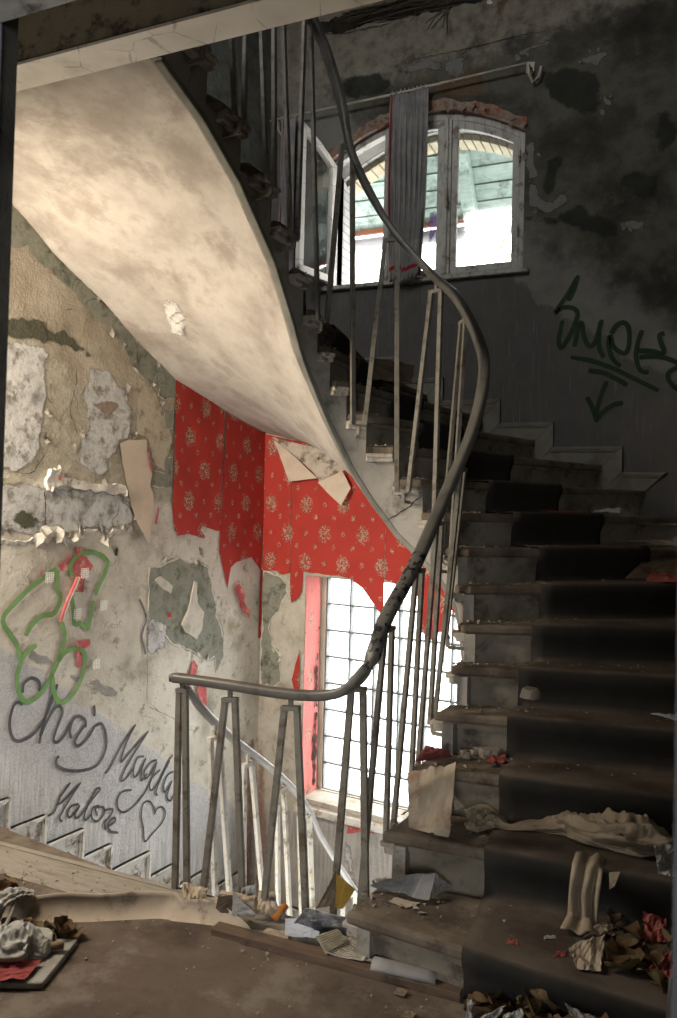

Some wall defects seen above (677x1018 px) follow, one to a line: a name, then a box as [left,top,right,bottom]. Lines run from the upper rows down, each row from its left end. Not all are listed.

flaking render [322,113,389,171]
flaking render [428,98,568,214]
leakage [544,67,601,112]
flaking render [1,209,176,550]
flaking render [146,546,226,673]